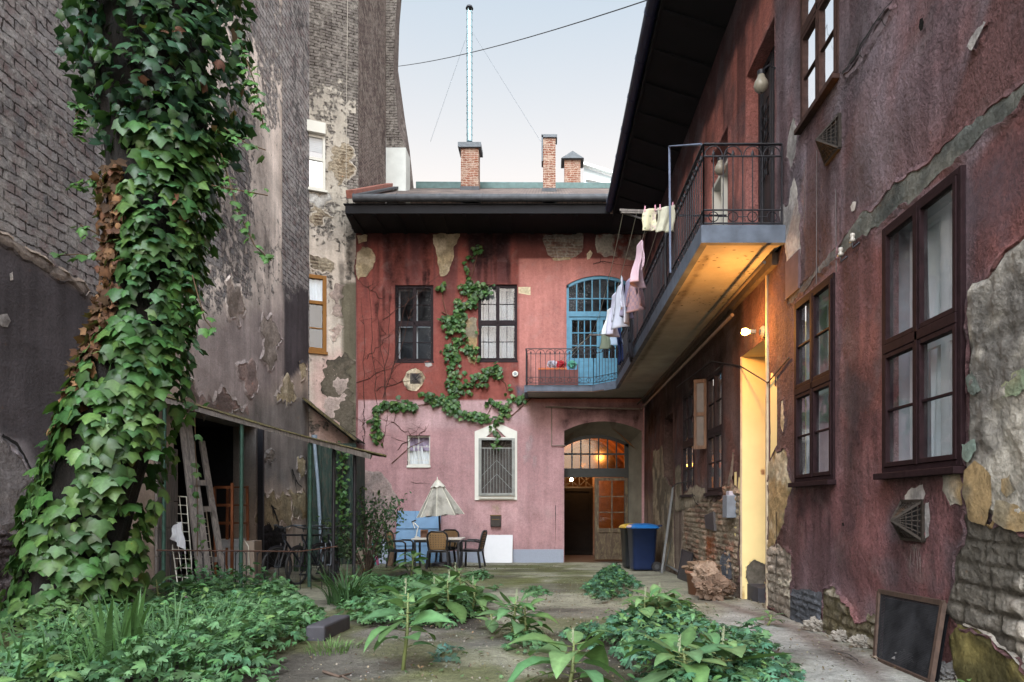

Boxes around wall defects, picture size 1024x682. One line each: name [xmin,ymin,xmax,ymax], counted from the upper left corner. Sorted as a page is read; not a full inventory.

spalling [967,13,993,58]
flaking render [309,142,357,227]
peeling [850,78,1024,219]
flaking render [225,275,246,329]
flaking render [309,234,377,342]
flaking render [431,233,461,278]
flaking render [541,233,644,262]
flaking render [182,311,356,433]
flaking render [903,226,1024,675]
flaking render [652,397,883,651]